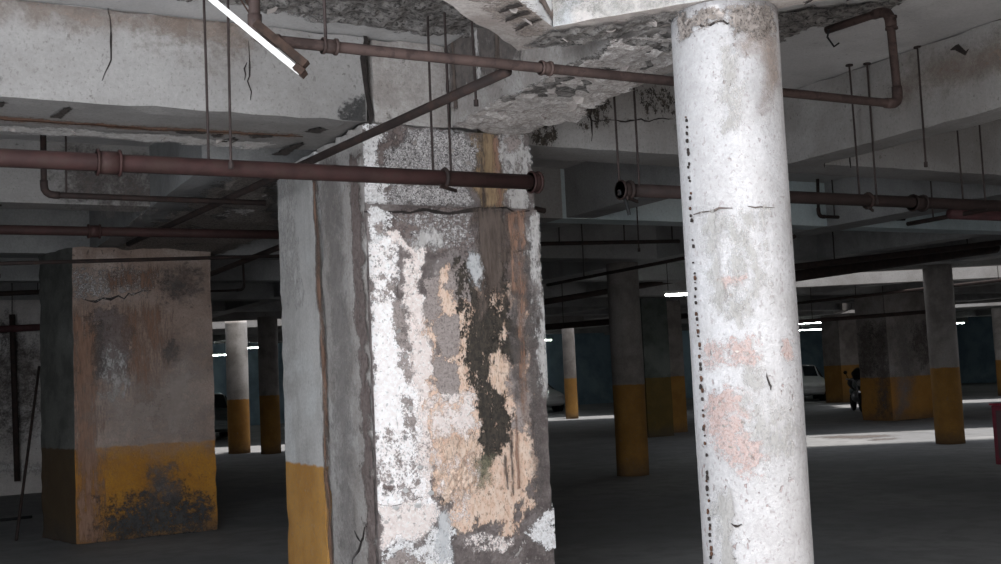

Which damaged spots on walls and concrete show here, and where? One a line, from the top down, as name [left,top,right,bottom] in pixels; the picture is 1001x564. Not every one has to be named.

crack [102,11,112,80]
spalling [260,0,484,38]
spalling [349,0,905,174]
peeling [347,182,556,564]
damp [384,206,528,479]
crack [585,109,774,564]
peeling [700,273,802,483]
damp [91,462,218,543]